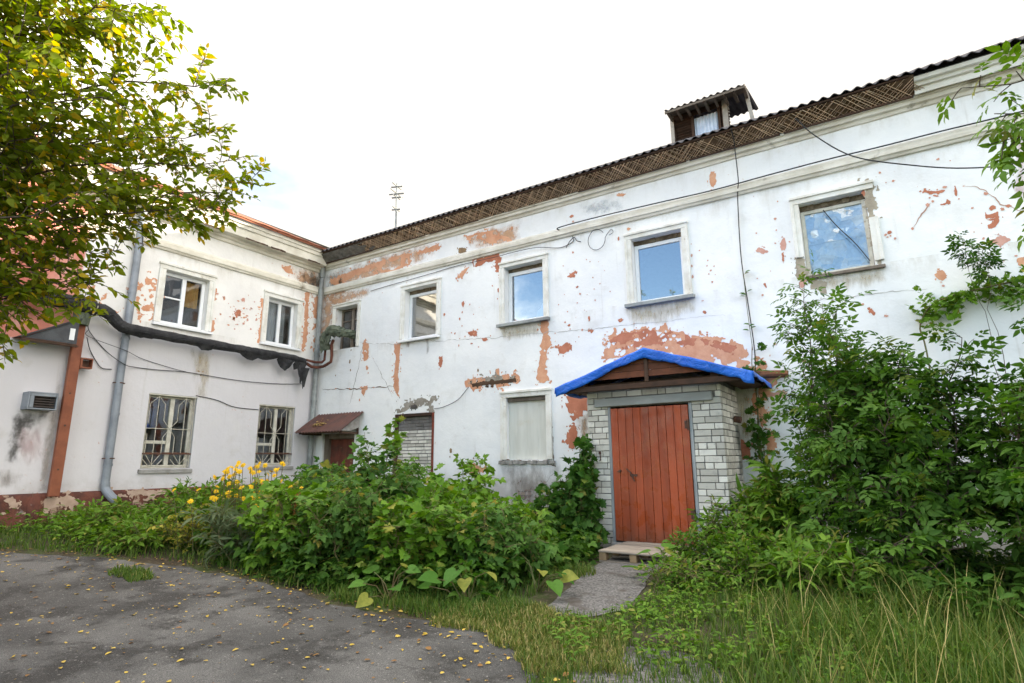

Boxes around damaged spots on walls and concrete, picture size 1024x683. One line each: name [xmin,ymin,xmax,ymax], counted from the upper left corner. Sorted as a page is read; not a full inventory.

peeling [917,186,964,205]
peeling [981,205,1011,248]
peeling [116,271,165,323]
peeling [329,243,441,285]
peeling [455,226,514,300]
peeling [934,268,947,287]
spalling [391,342,441,414]
spalling [465,368,521,393]
crack [323,315,716,402]
peeling [534,265,787,460]
leakage [10,415,33,458]
peeling [43,490,85,517]